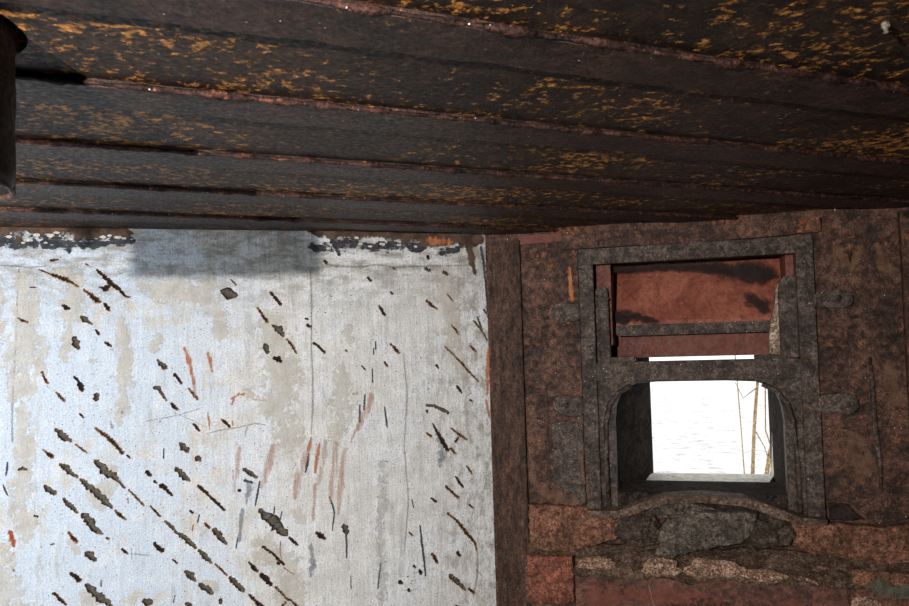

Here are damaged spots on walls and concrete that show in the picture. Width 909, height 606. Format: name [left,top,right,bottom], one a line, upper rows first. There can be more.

rust [299,0,909,94]
rust [15,73,909,165]
rust [16,180,739,220]
rust [15,138,909,204]
peeling [0,231,264,606]
rust [183,348,195,385]
peeling [242,291,305,457]
peeling [248,507,307,606]